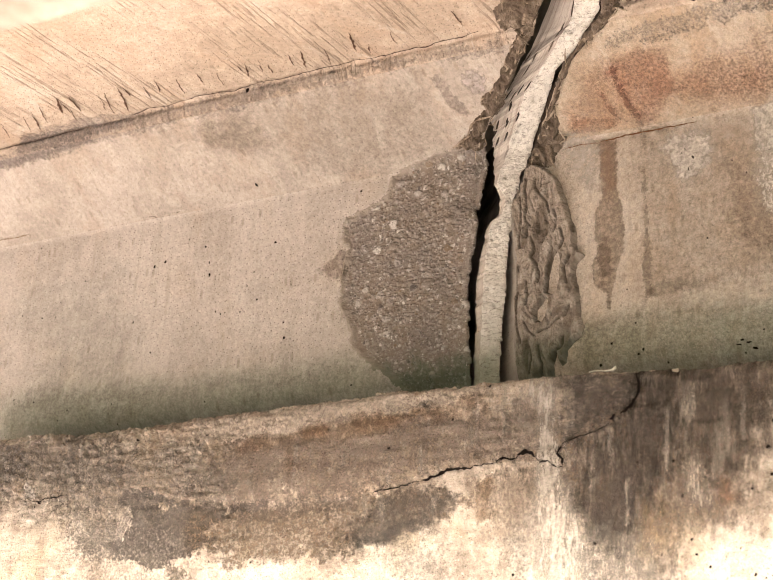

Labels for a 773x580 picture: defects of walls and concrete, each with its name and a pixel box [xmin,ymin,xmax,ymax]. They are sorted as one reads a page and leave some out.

crack [0,31,478,150]
rust [605,49,674,122]
spalling [337,143,489,392]
peeling [511,165,585,381]
leakage [567,135,625,309]
leakage [0,360,773,580]
crack [372,372,640,494]